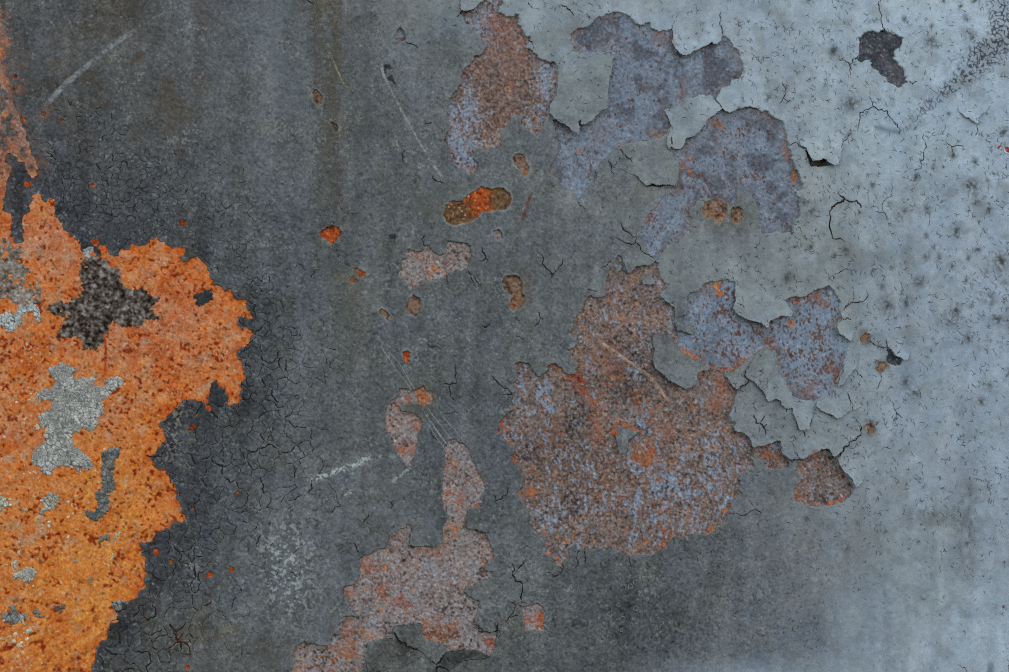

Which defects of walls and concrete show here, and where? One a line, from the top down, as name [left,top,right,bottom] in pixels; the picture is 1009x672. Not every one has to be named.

peeling [857,31,908,88]
peeling [958,92,995,123]
rust [0,6,253,672]
crack [2,77,344,672]
peeling [384,386,433,466]
peeling [399,241,471,316]
peeling [444,0,874,568]
peeling [286,439,503,672]